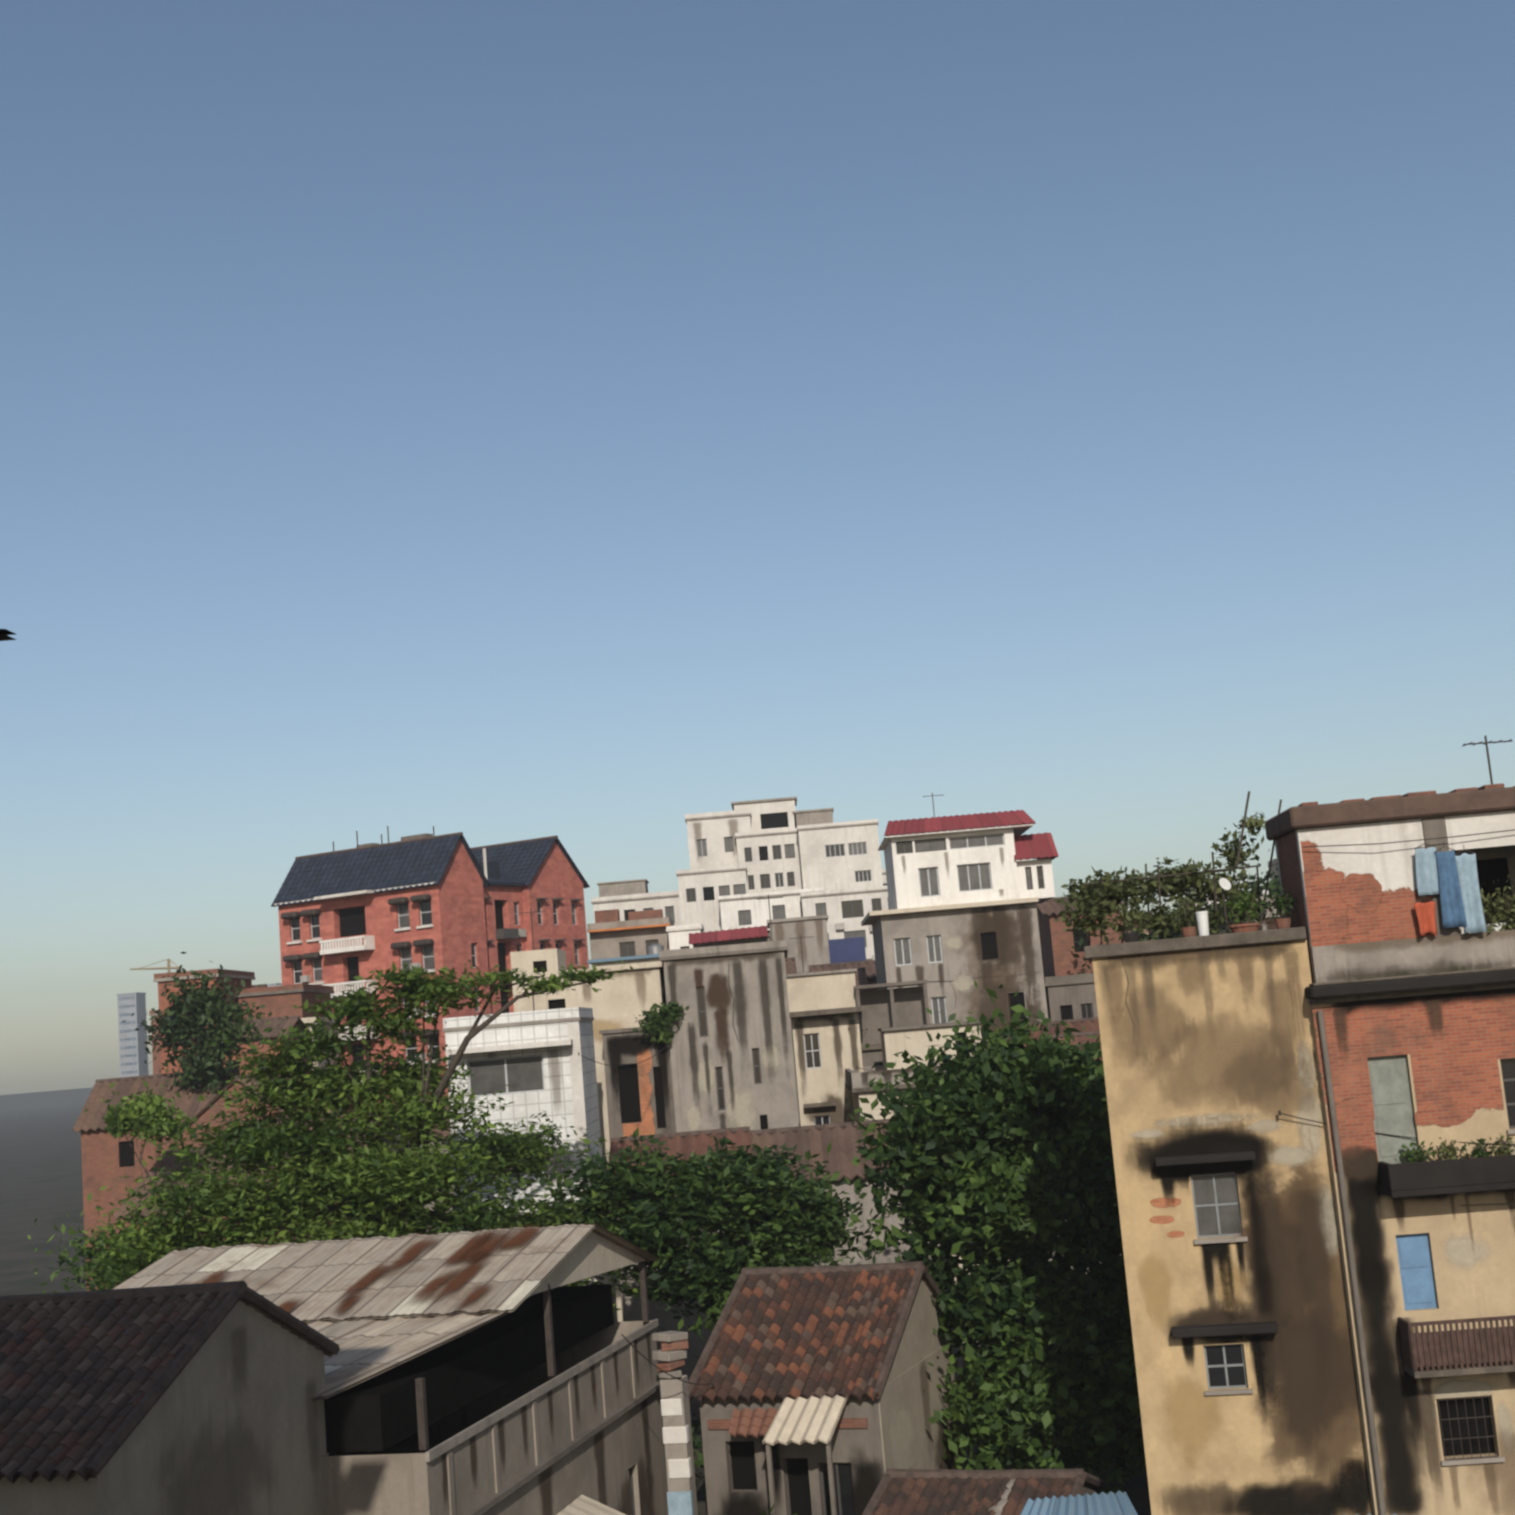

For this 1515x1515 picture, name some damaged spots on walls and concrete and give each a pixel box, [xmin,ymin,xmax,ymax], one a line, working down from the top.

flaking render [1301,840,1437,947]
leakage [668,951,947,1099]
leakage [809,1096,847,1124]
flaking render [1274,996,1515,1176]
corrosion [181,1270,226,1285]
corrosion [279,1300,298,1312]
corrosion [337,1239,435,1313]
corrosion [416,1227,539,1306]
leakage [1140,1125,1515,1515]